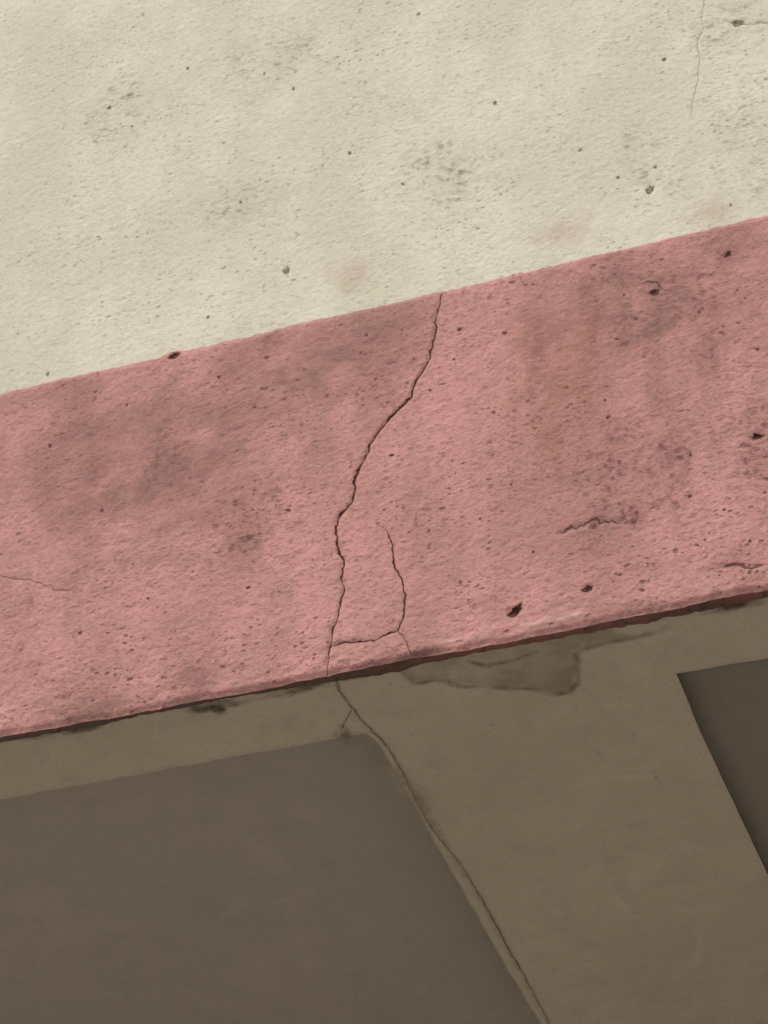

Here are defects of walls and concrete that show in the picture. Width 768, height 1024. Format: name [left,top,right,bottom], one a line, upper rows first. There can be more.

crack [690,1,704,117]
crack [327,293,549,1024]